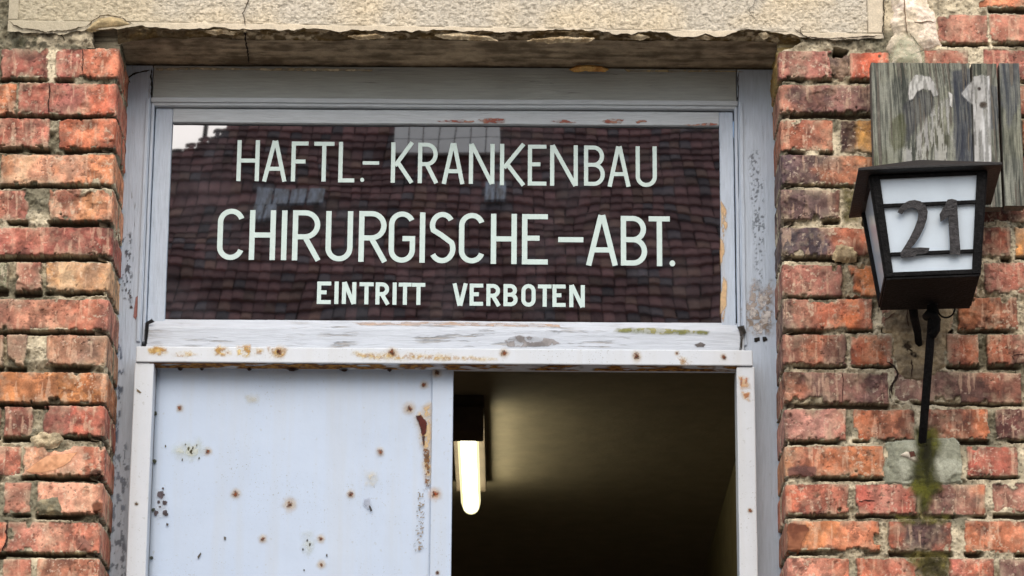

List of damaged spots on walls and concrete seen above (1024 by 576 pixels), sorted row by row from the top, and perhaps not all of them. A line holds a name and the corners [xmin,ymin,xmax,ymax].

crack [241,0,249,62]
spalling [117,26,808,44]
peeling [121,234,138,320]
corrosion [149,346,518,374]
peeling [357,322,560,347]
corrosion [593,352,749,399]
peeling [746,284,772,342]
corrosion [408,406,438,551]
leakage [898,427,947,524]
leakage [905,552,950,576]